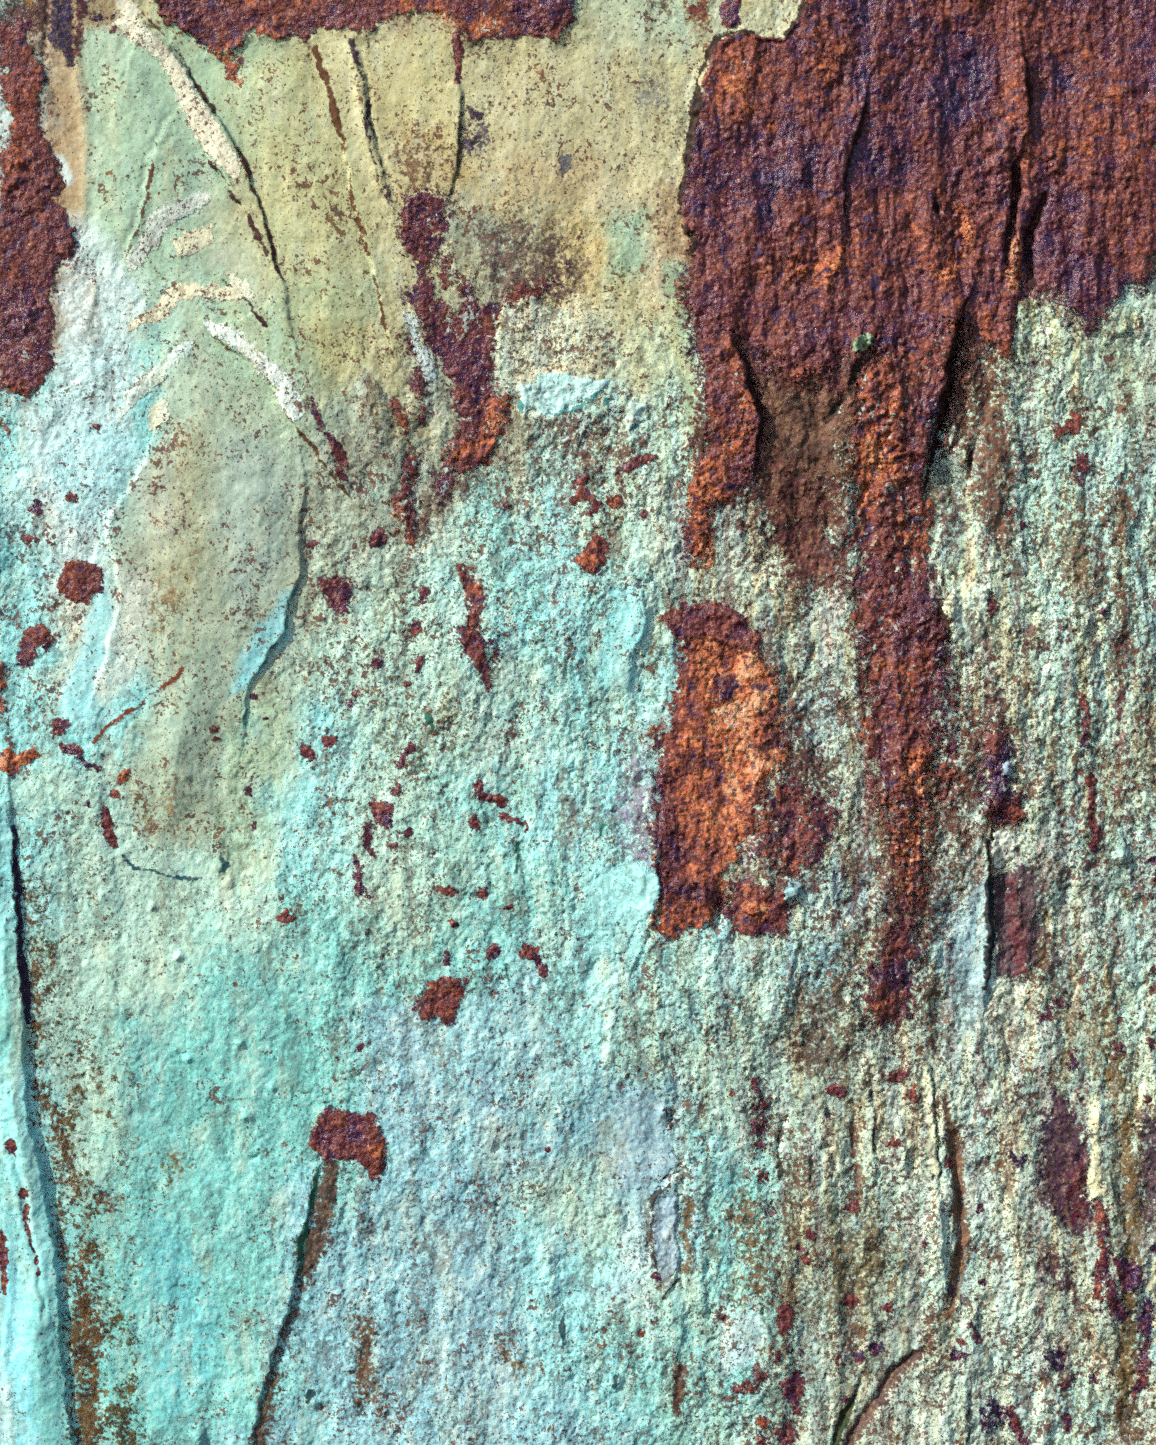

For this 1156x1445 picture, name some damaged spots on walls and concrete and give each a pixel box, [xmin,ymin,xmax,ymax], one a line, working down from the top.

corrosion [92,12,139,33]
corrosion [153,0,577,90]
corrosion [0,14,79,402]
corrosion [368,187,571,553]
corrosion [27,498,44,517]
corrosion [20,531,56,546]
corrosion [640,0,1156,1041]
corrosion [0,559,104,722]
crack [11,825,33,1024]
crack [981,839,997,990]
corrosion [1066,1048,1079,1073]
corrosion [307,1101,389,1191]